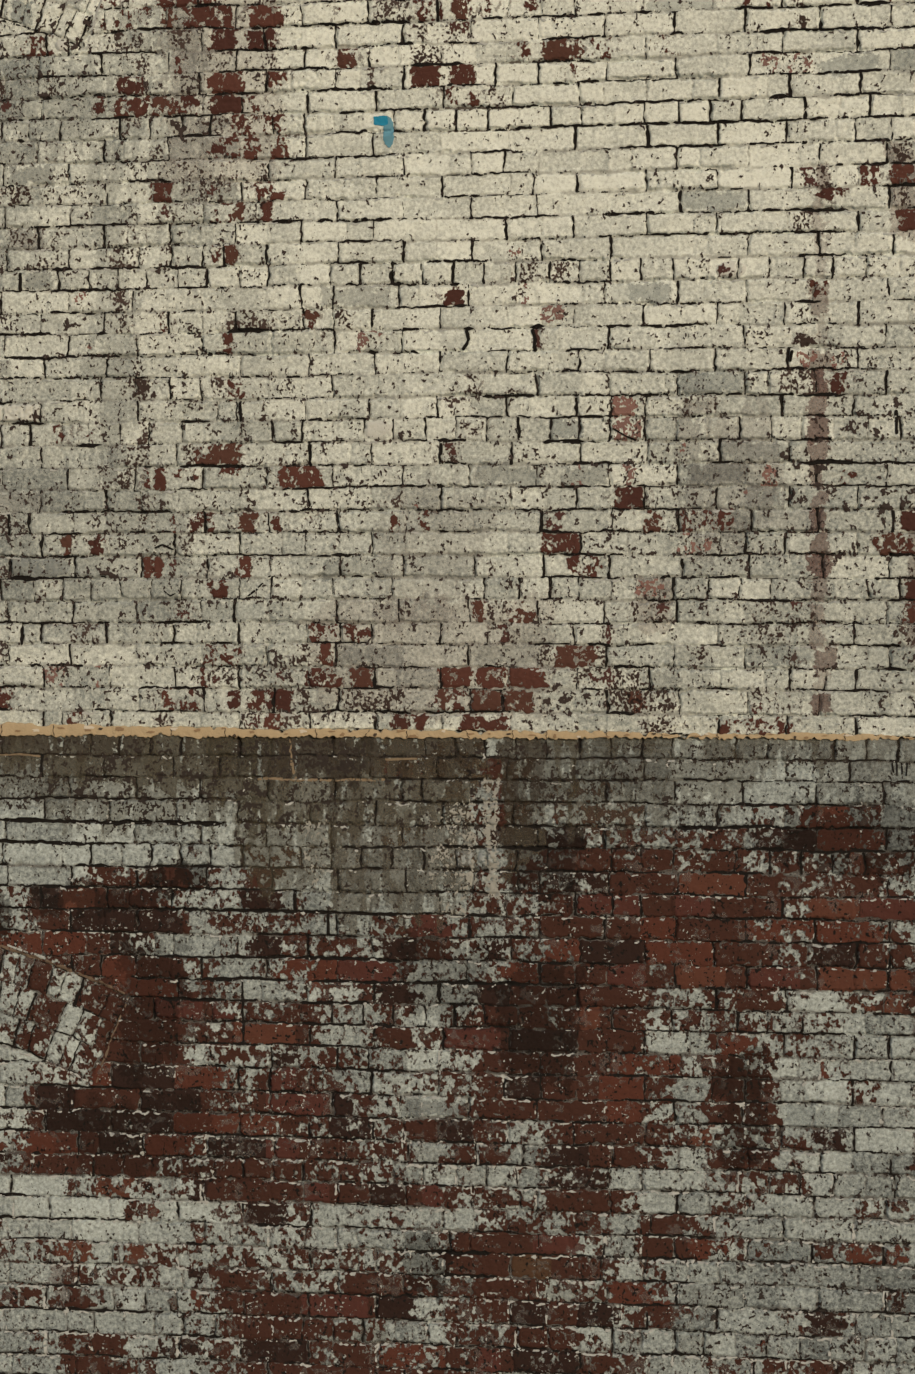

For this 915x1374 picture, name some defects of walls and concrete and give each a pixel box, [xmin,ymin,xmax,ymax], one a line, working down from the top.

peeling [720,0,830,174]
damp [102,112,335,166]
peeling [585,151,714,229]
peeling [681,174,765,282]
peeling [777,136,915,240]
peeling [588,249,623,305]
peeling [760,262,828,297]
peeling [836,238,915,335]
peeling [586,315,642,364]